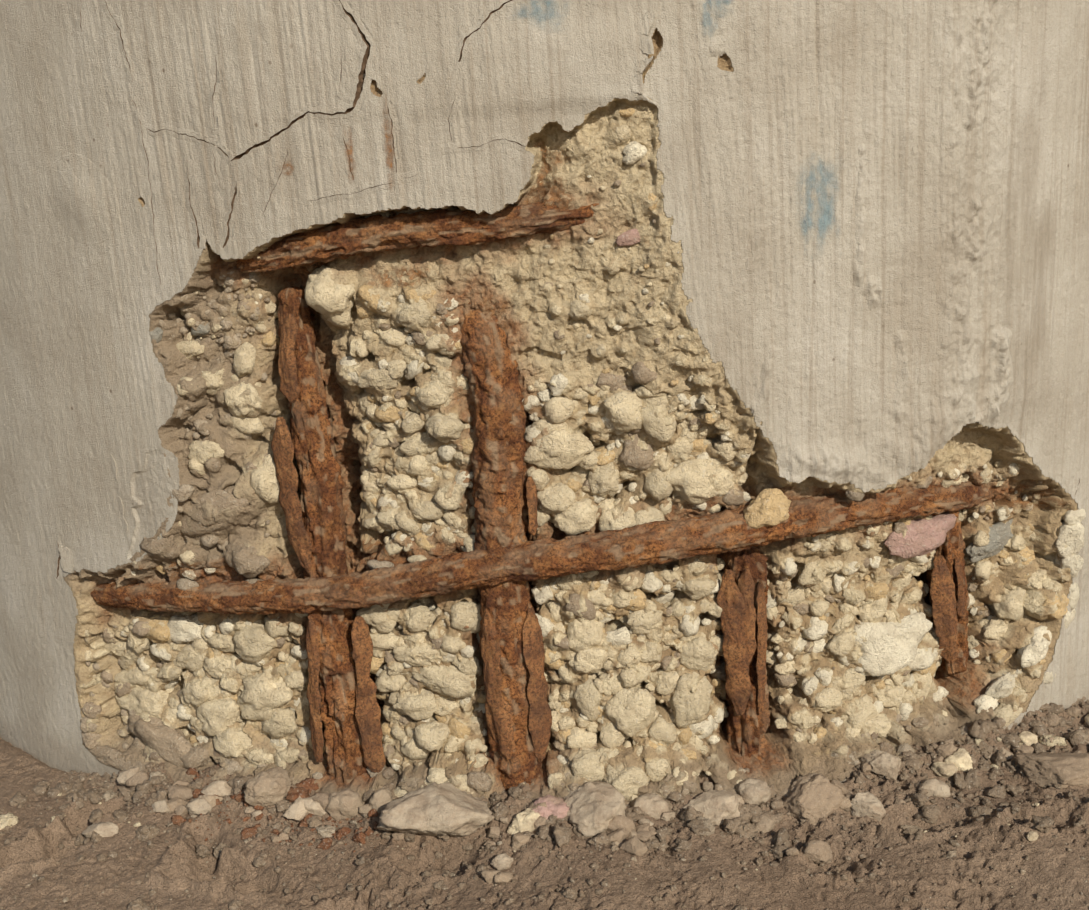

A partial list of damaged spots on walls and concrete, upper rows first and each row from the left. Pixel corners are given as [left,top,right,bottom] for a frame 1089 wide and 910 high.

crack [76,0,422,294]
spalling [370,79,383,97]
crack [441,0,529,155]
flaking render [628,28,663,104]
spalling [717,54,734,72]
rust [235,202,599,275]
spalling [58,98,1086,808]
rust [90,286,1072,791]